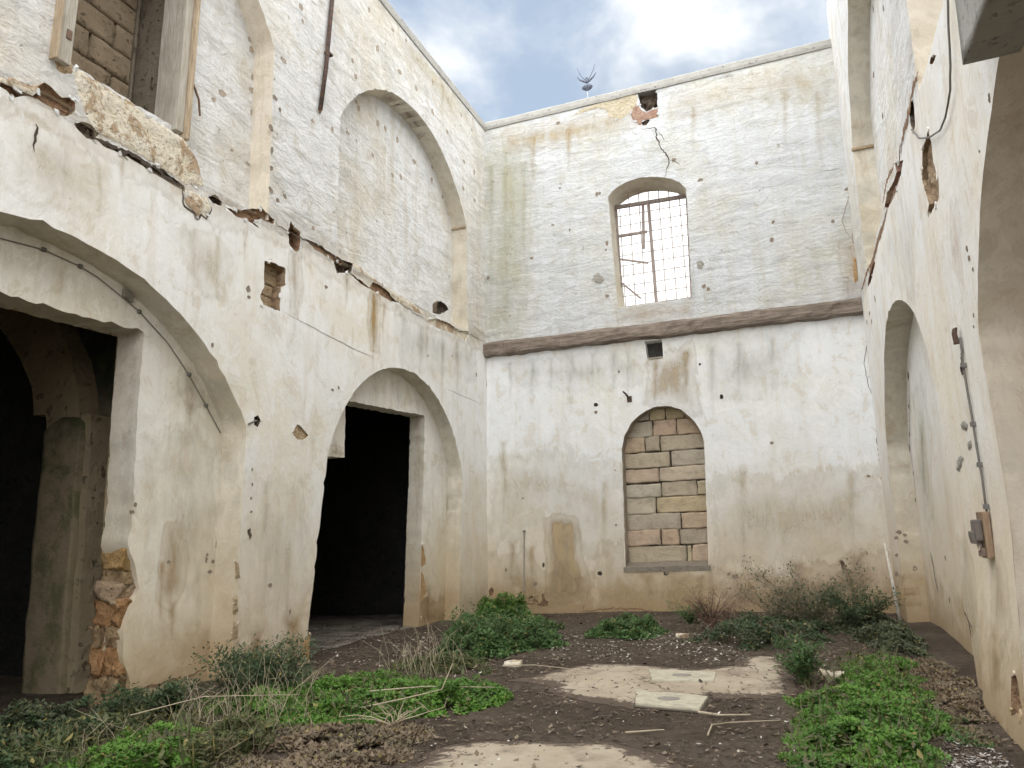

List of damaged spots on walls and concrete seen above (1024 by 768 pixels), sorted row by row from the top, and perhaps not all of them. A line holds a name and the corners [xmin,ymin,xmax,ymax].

flaking render [574,90,660,125]
flaking render [0,64,274,228]
crack [648,127,679,170]
crack [842,71,918,291]
flaking render [908,98,939,217]
flaking render [246,259,286,311]
flaking render [286,222,469,341]
flaking render [291,424,308,442]
leakage [552,521,580,595]
flaking render [83,545,136,707]
flaking render [1009,670,1022,725]